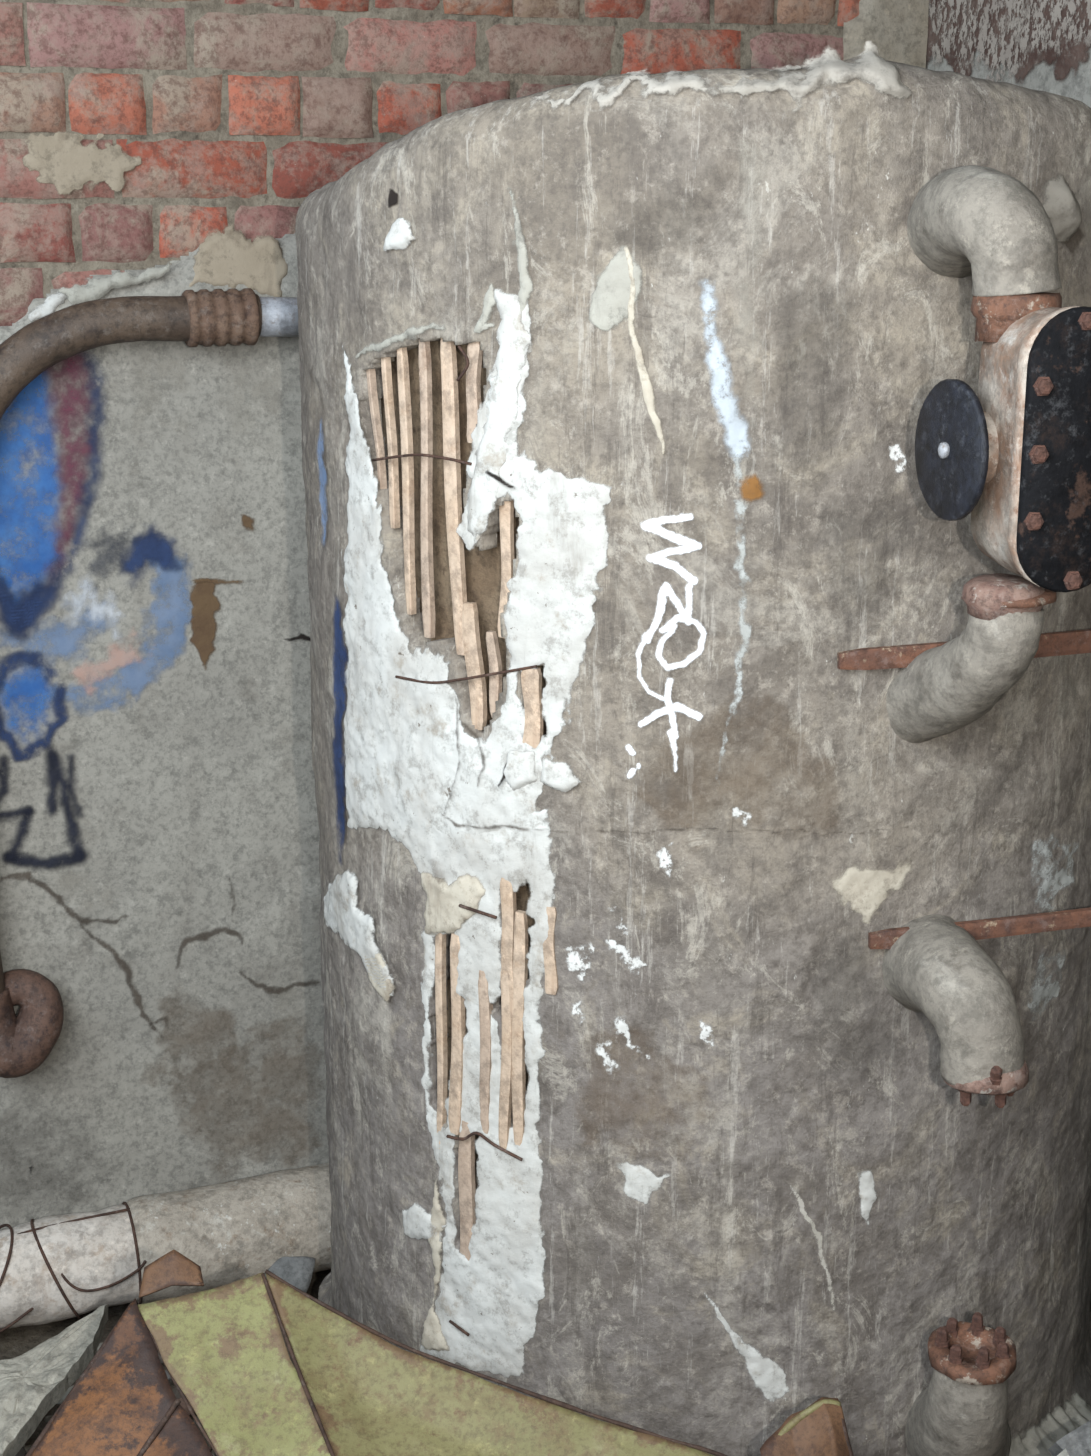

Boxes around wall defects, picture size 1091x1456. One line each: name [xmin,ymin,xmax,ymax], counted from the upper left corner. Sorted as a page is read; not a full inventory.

peeling [926,0,1091,82]
peeling [22,131,141,195]
peeling [28,224,288,322]
peeling [589,247,665,455]
peeling [342,189,611,1378]
peeling [832,862,911,924]
crack [0,872,166,1030]
crack [177,905,240,965]
crack [241,972,319,993]
peeling [323,870,394,1002]
peeling [617,1162,669,1204]